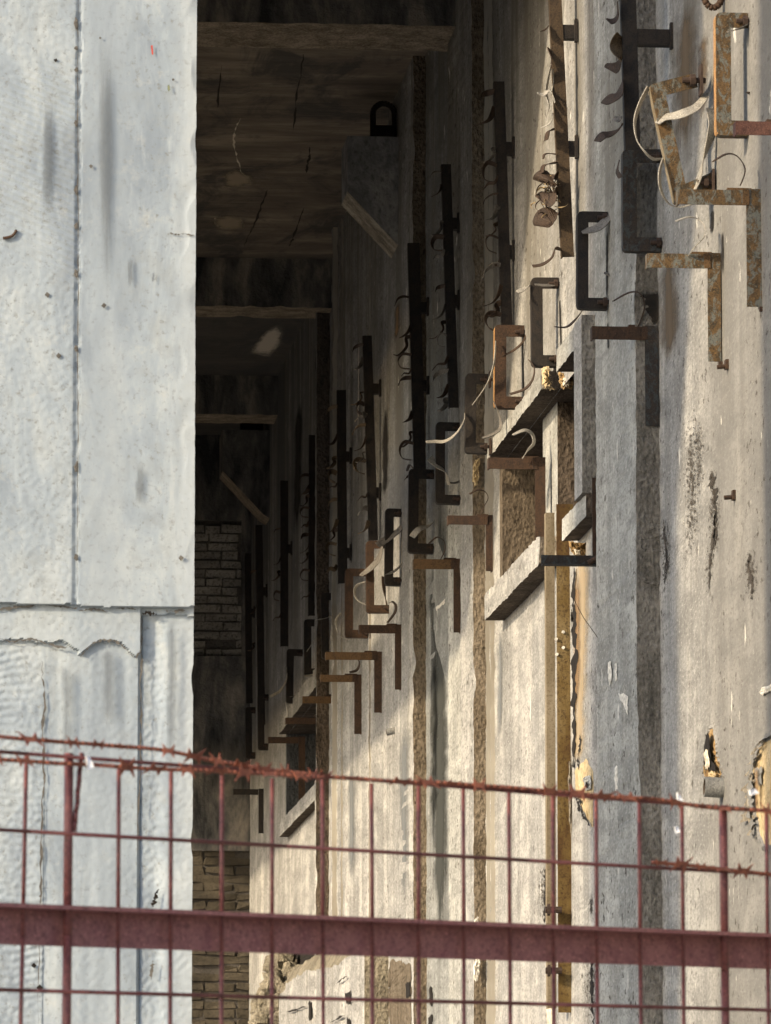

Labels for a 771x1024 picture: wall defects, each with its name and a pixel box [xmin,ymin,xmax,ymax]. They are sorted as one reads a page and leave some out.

crack [72,17,80,232]
damp [101,99,110,226]
crack [0,258,187,903]
peeling [568,759,594,834]
hole [701,723,725,780]
spalling [740,733,771,853]
hole [296,954,314,965]